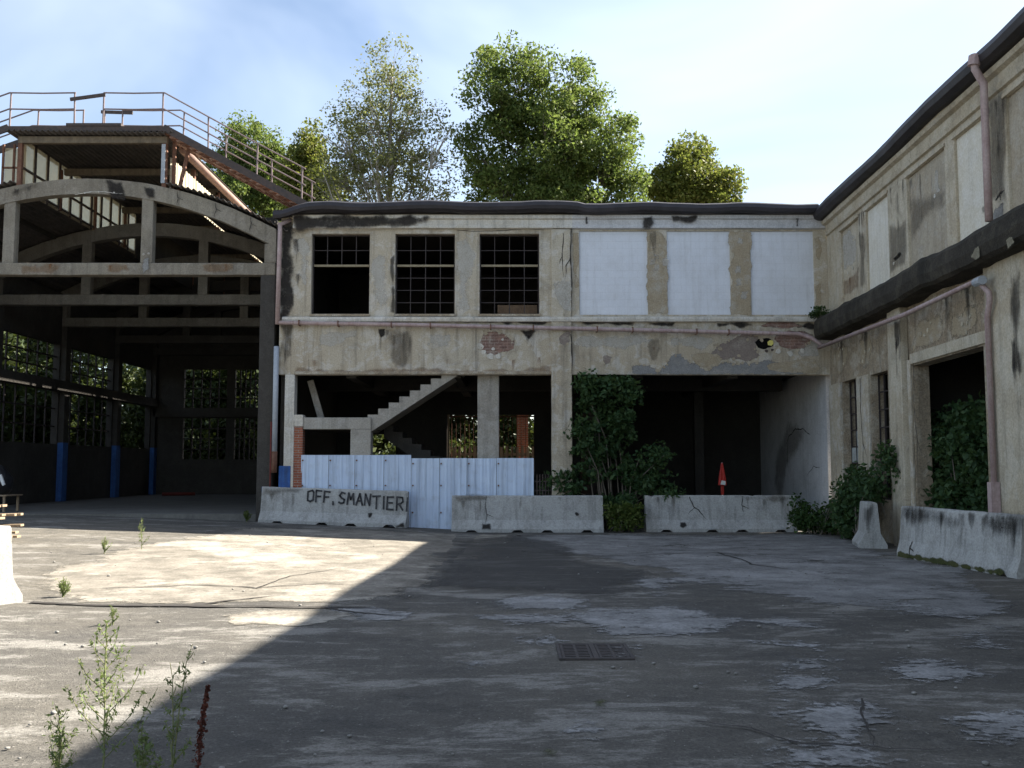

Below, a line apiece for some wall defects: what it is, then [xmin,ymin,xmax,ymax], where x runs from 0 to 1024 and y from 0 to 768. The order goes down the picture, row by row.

peeling [646,230,669,314]
peeling [728,231,752,316]
flaking render [477,330,515,359]
flaking render [632,322,820,375]
water stain [1011,283,1020,373]
water stain [969,514,1017,540]